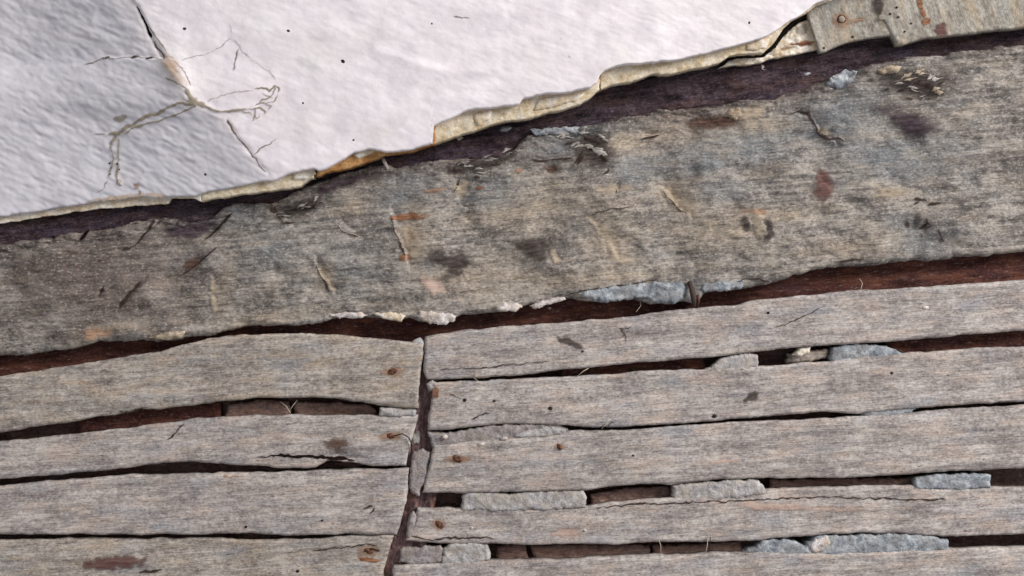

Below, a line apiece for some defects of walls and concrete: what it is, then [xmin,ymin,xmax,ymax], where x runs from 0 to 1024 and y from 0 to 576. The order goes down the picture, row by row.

crack [726,14,807,61]
rust [917,0,947,36]
crack [87,7,280,192]
spalling [0,0,833,224]
rust [390,212,428,261]
crack [261,453,361,467]